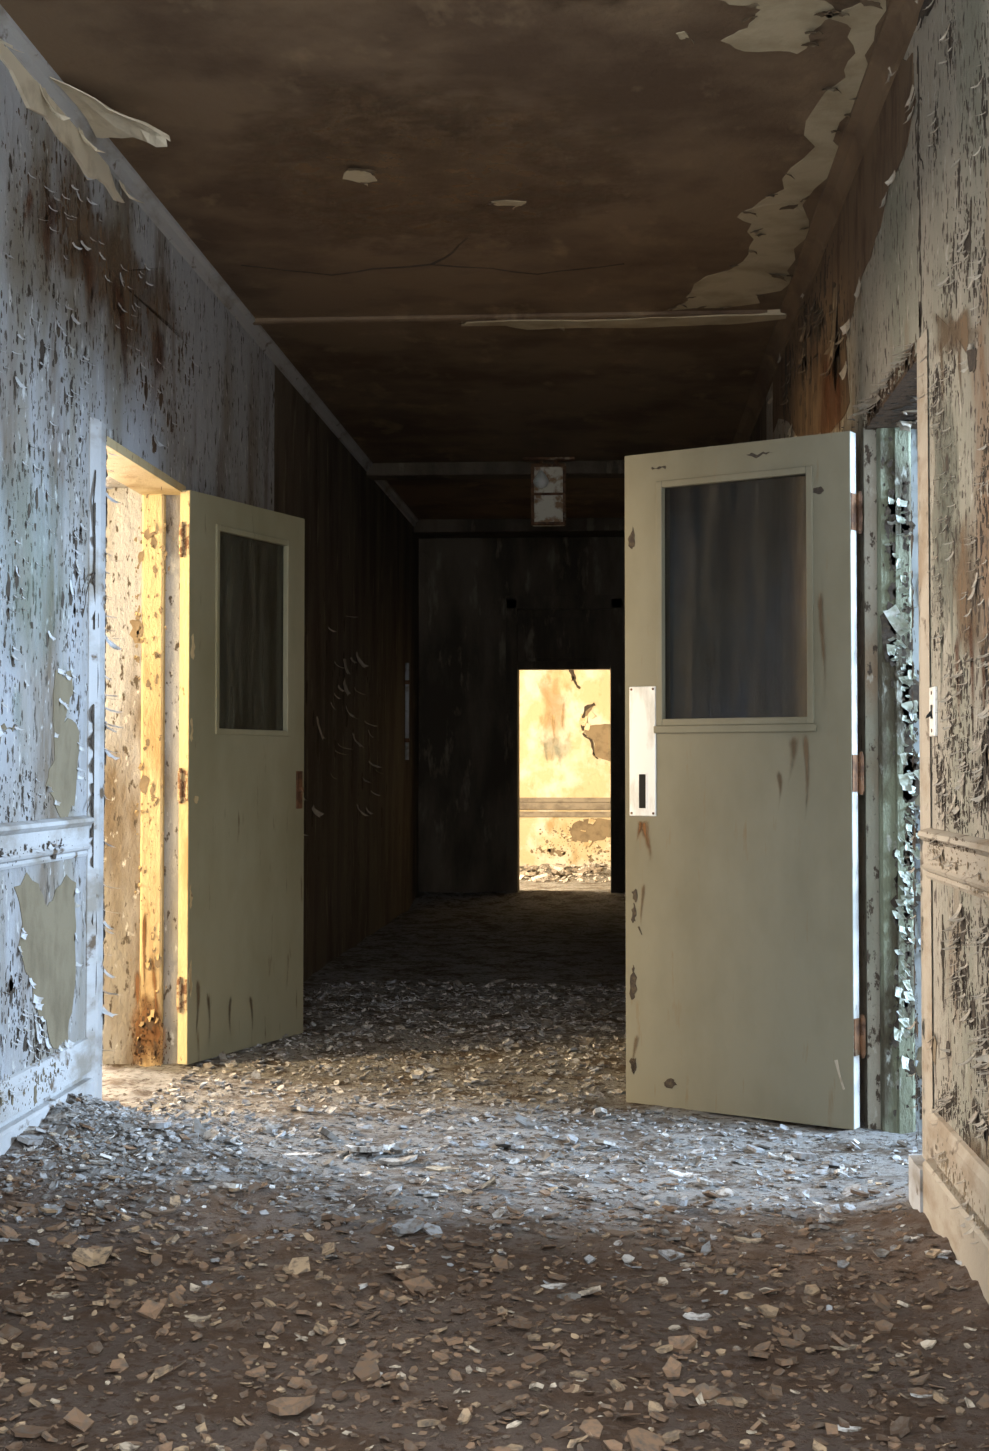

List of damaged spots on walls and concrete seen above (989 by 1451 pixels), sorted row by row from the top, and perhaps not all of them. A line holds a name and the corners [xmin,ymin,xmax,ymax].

leakage [28,165,169,375]
peeling [0,84,211,823]
peeling [459,0,989,1244]
peeling [0,836,82,1116]
peeling [102,722,170,1076]